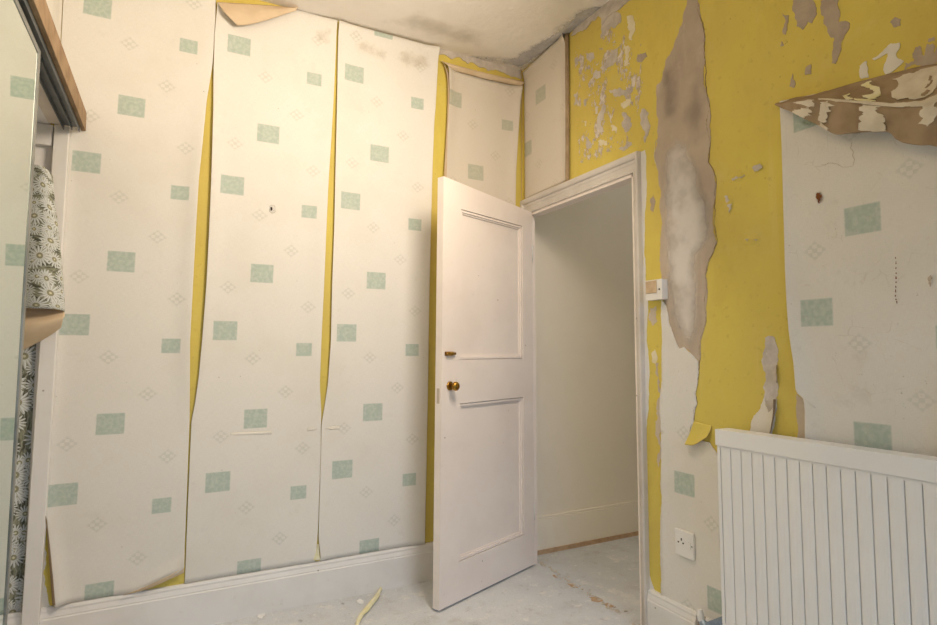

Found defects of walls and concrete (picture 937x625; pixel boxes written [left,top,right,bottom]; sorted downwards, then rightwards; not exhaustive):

peeling [780,0,850,64]
flaking render [570,0,717,403]
flaking render [761,336,779,413]